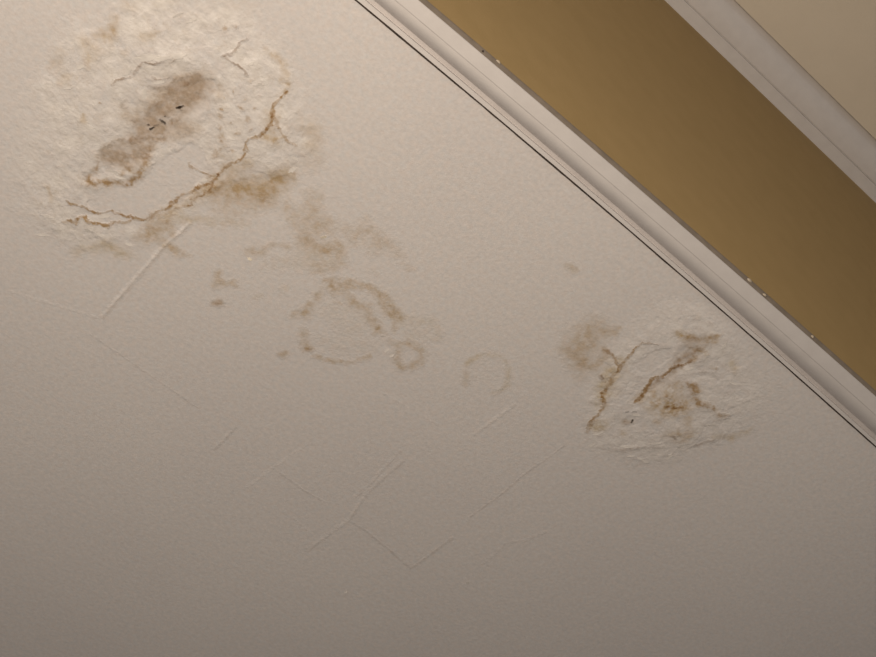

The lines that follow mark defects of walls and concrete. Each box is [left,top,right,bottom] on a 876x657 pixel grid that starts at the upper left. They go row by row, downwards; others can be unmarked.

crack [61,37,299,229]
water stain [66,111,447,374]
water stain [550,305,625,387]
crack [355,0,876,447]